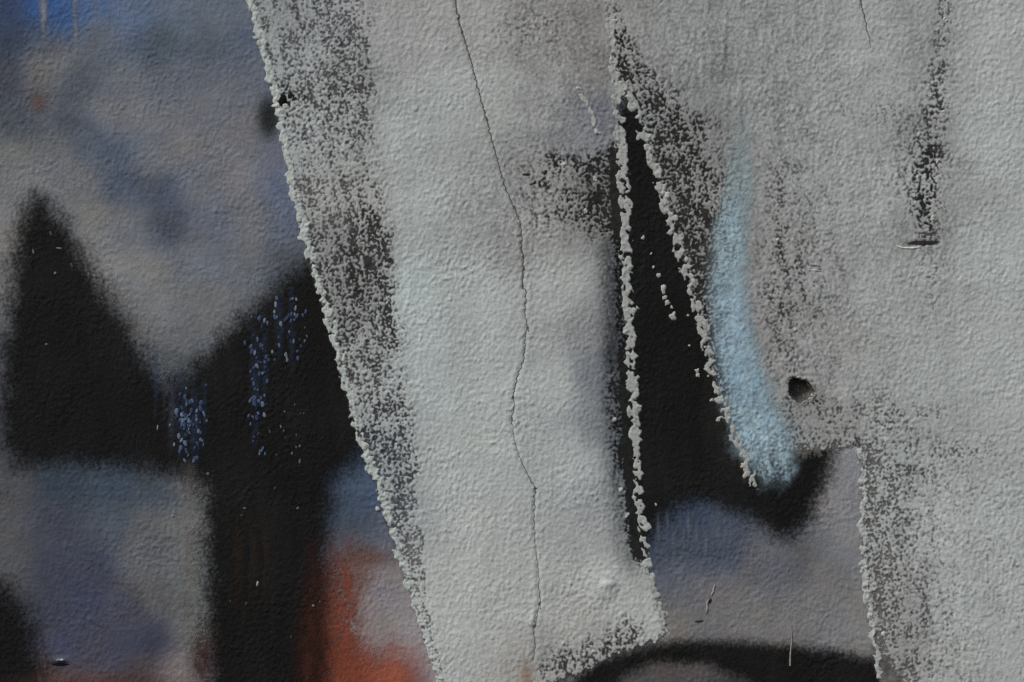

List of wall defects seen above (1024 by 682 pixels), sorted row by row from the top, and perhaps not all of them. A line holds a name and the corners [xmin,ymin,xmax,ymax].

peeling [270,0,373,144]
peeling [614,29,729,314]
spalling [166,387,208,463]
spalling [244,296,308,464]
peeling [287,178,425,594]
crack [455,0,541,660]
peeling [608,338,647,562]
hole [786,377,823,404]